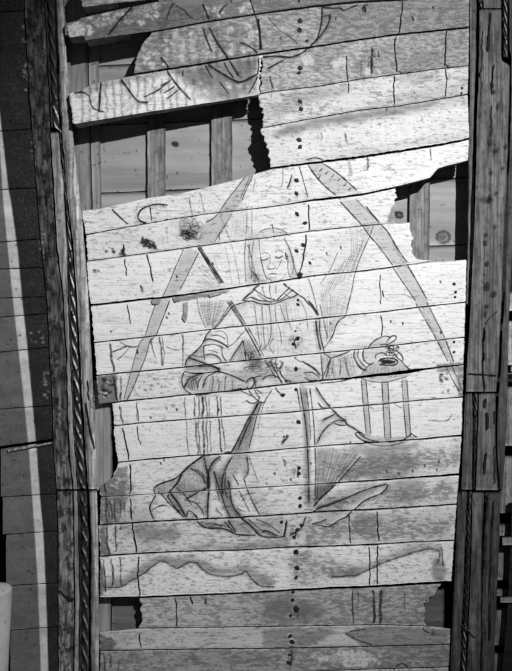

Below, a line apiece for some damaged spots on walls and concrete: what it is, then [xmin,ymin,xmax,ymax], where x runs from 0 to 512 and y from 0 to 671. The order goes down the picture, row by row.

peeling [142,32,198,69]
peeling [225,24,258,55]